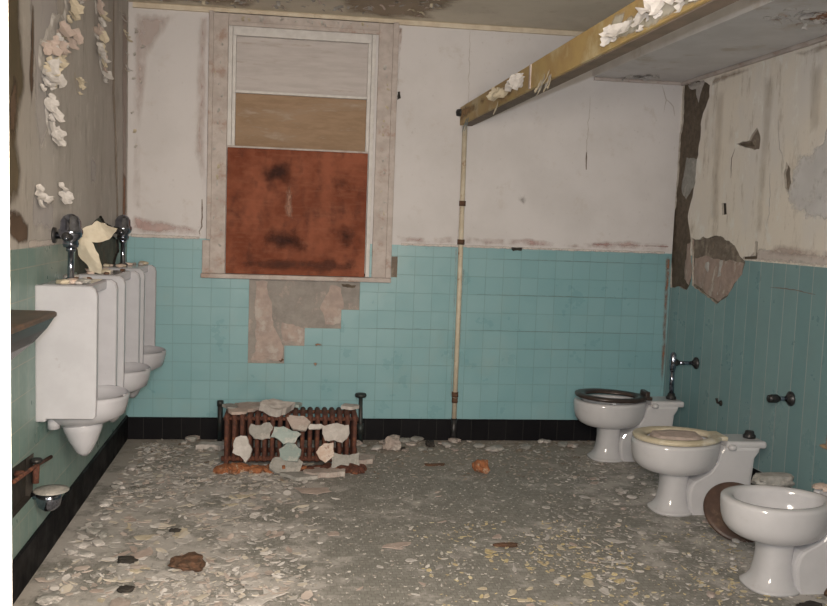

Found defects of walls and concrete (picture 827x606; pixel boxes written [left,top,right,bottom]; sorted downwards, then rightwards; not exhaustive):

water stain [348,0,449,18]
peeling [32,0,114,146]
spalling [740,130,760,150]
peeling [33,182,74,227]
spalling [672,81,745,303]
peeling [248,279,360,363]